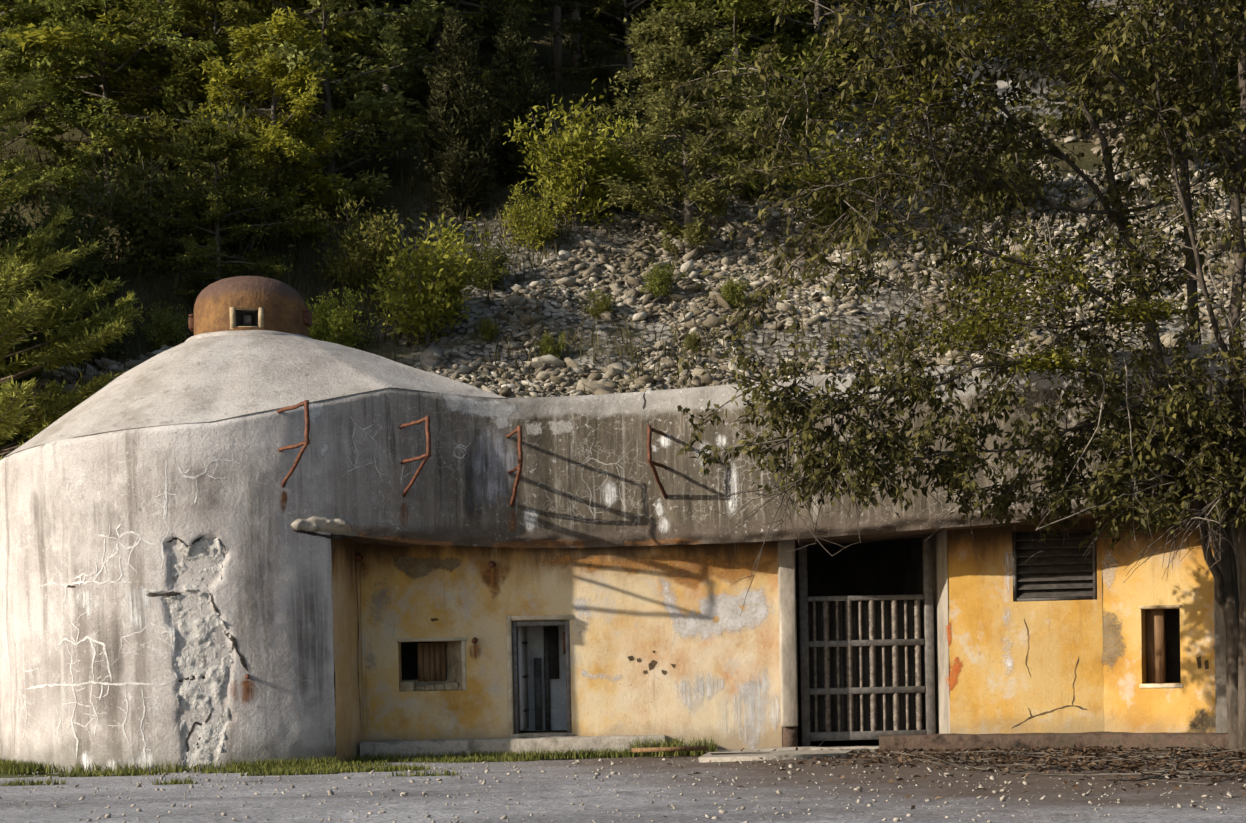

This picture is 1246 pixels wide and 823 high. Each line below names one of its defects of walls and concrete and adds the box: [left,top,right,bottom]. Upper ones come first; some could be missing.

leakage [393,557,460,578]
leakage [542,554,770,586]
crack [18,459,241,758]
leakage [130,589,148,625]
spalling [145,535,233,768]
crack [209,592,249,672]
peeling [662,581,768,638]
crack [1023,619,1031,677]
corrosion [242,674,252,701]
crack [1011,657,1087,729]